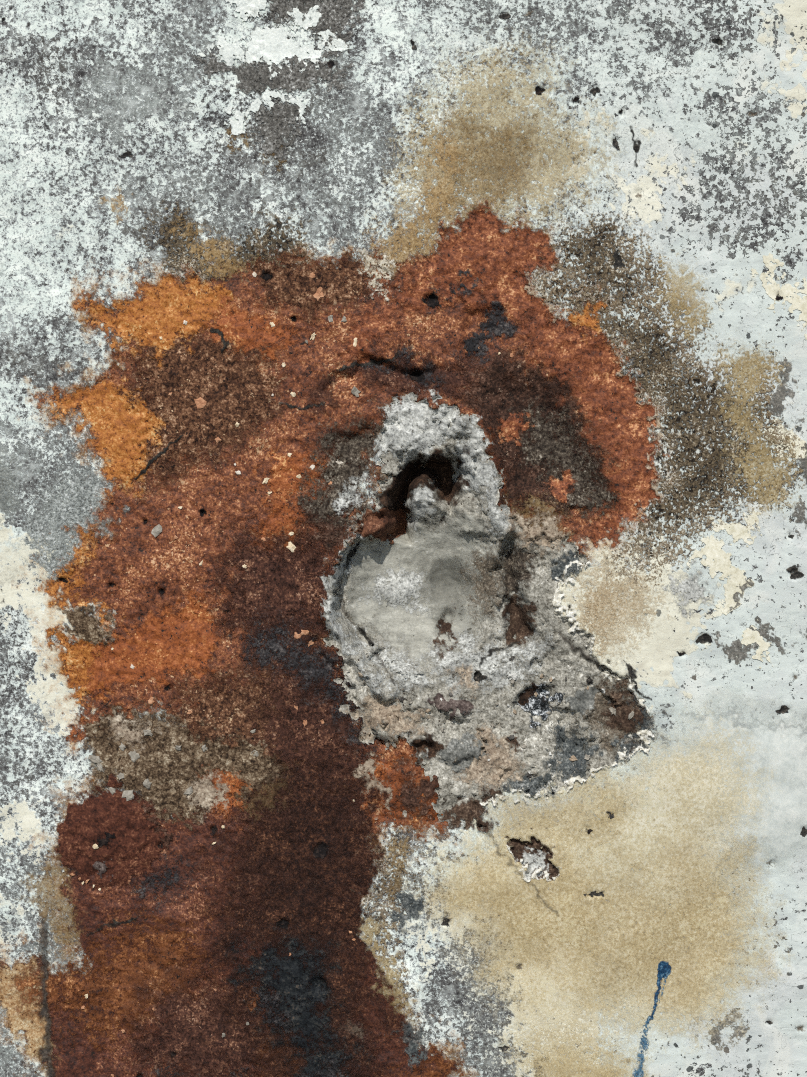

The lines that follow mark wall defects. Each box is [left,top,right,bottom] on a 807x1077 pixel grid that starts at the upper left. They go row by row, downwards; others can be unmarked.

peeling [194,0,367,160]
water stain [371,58,604,267]
peeling [614,351,662,469]
water stain [528,213,805,657]
corrosion [0,200,669,1077]
spalling [320,389,664,833]
spalling [506,828,561,882]
water stain [350,735,766,1077]